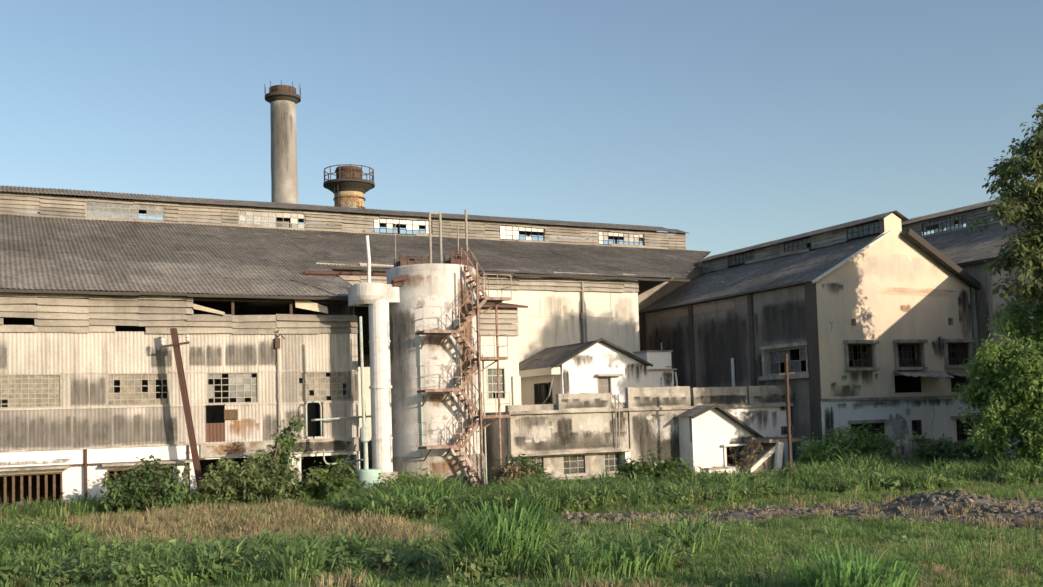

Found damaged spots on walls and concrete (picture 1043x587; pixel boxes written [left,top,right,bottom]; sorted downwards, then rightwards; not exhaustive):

water stain [151,350,172,366]
water stain [190,343,277,365]
water stain [389,312,414,360]
rust [428,282,472,378]
water stain [958,290,1002,351]
water stain [71,378,106,404]
water stain [515,300,806,471]
water stain [0,416,178,466]
water stain [825,399,949,443]